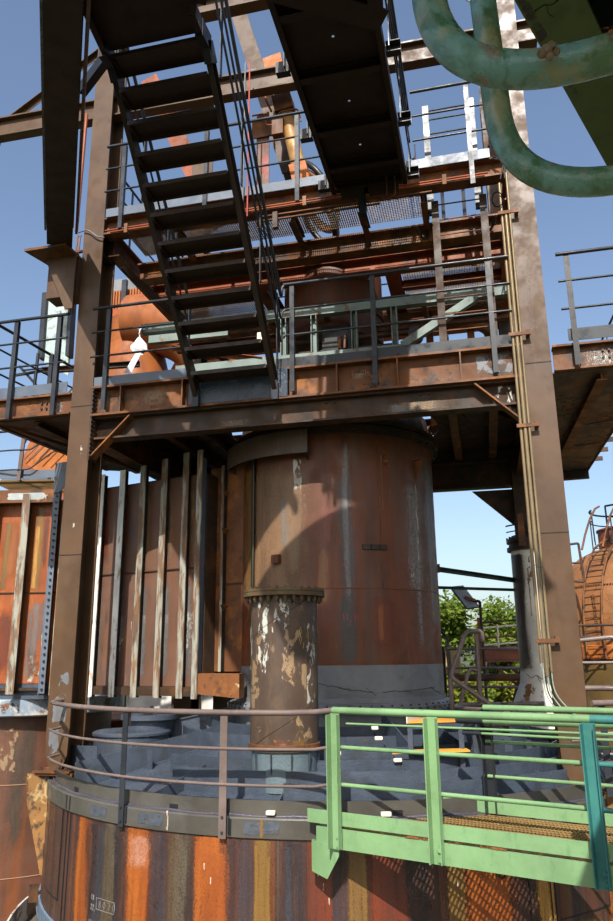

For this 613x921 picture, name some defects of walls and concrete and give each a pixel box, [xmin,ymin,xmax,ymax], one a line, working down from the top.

peeling [475,353,513,374]
corrosion [0,512,21,589]
corrosion [29,507,50,590]
corrosion [103,499,113,565]
corrosion [0,610,12,675]
peeling [250,599,315,709]
crack [322,684,440,699]
peeling [0,728,19,772]
corrosion [70,816,96,921]
corrosion [119,827,157,921]
corrosion [187,836,239,921]
corrosion [298,841,342,921]